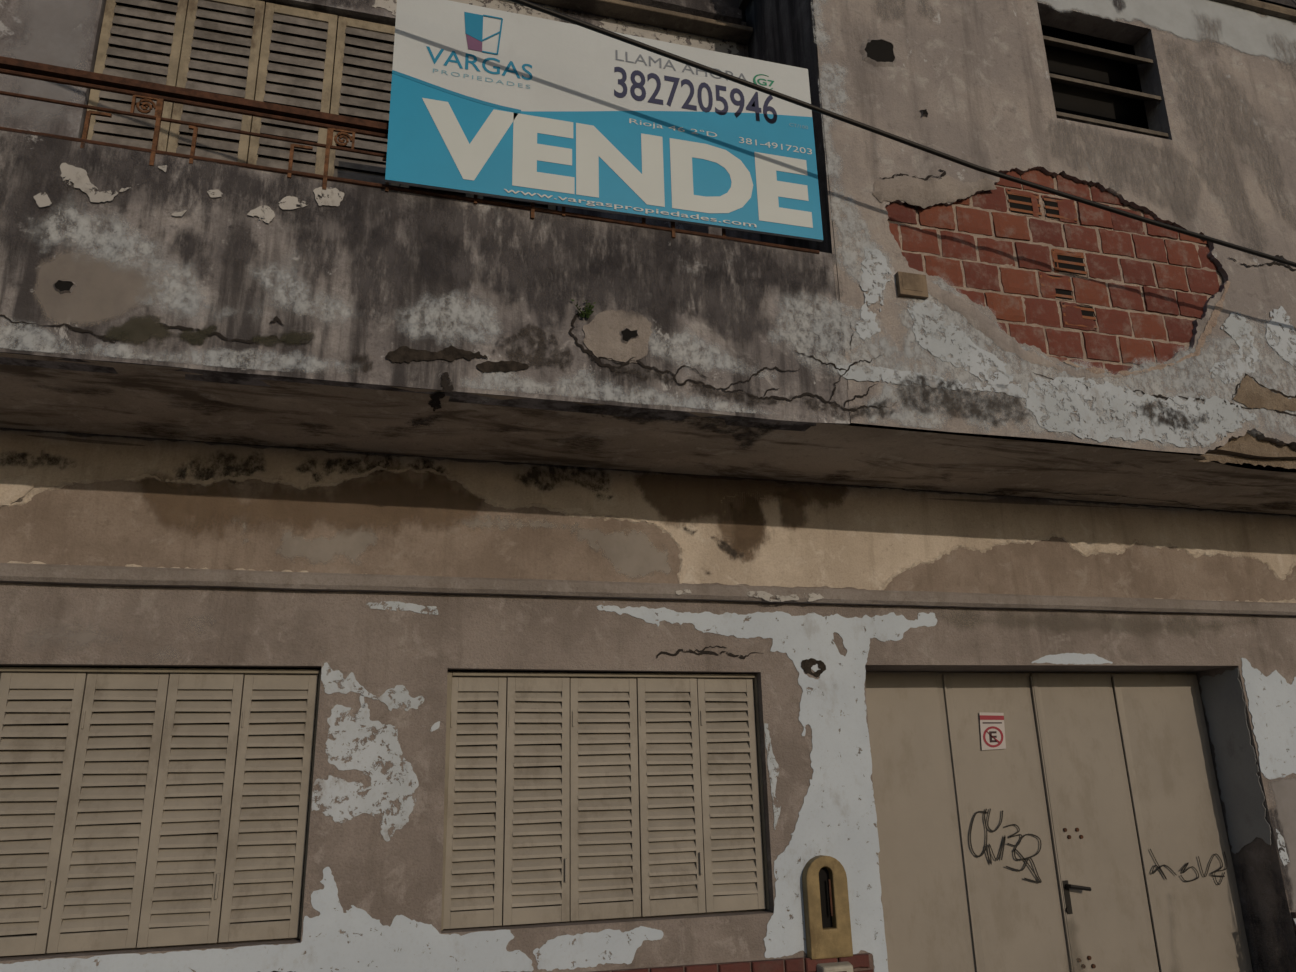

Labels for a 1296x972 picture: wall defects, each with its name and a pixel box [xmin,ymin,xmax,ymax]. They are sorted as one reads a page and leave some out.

peeling [1038,0,1296,64]
leakage [174,231,207,276]
peeling [769,64,1296,469]
crack [0,314,118,344]
crack [160,316,313,344]
crack [569,313,897,411]
peeling [0,466,692,595]
leakage [141,424,671,577]
leakage [637,471,850,560]
peeling [312,662,424,841]
peeling [597,531,1296,972]
peeling [0,867,664,972]